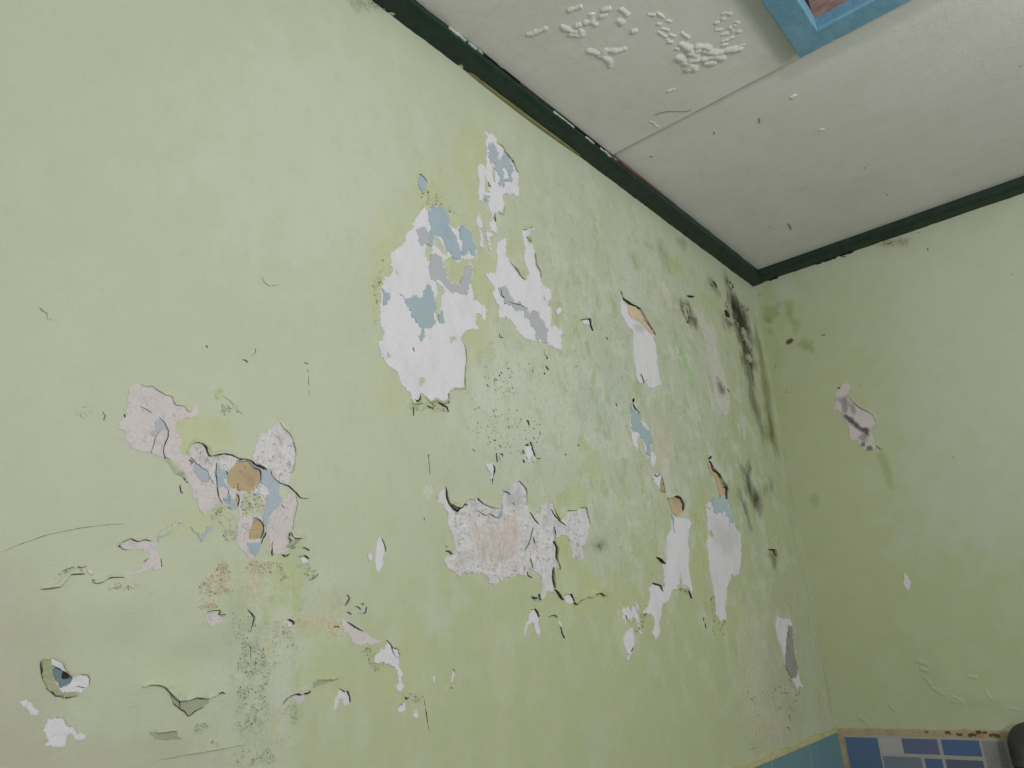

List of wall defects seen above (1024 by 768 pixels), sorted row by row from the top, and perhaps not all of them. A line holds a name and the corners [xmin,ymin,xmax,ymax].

peeling [116,383,308,585]
peeling [372,131,565,416]
peeling [427,480,591,638]
peeling [619,291,662,389]
peeling [616,398,693,661]
water stain [681,295,730,415]
peeling [706,495,742,640]
water stain [709,279,754,367]
peeling [833,383,880,452]
spalling [40,656,91,699]
peeling [142,559,351,768]
peeling [334,603,424,718]